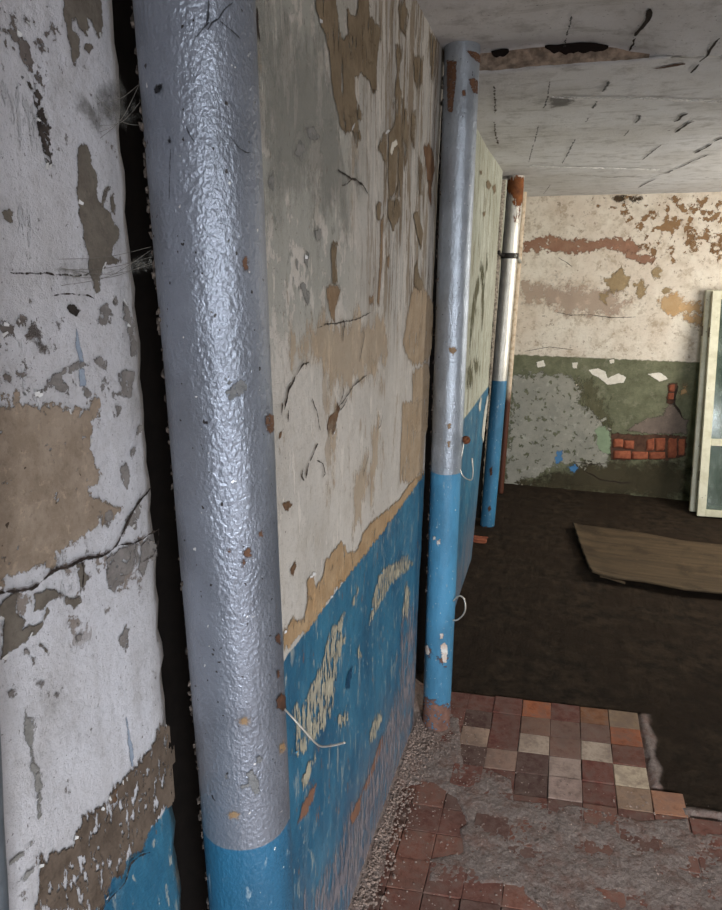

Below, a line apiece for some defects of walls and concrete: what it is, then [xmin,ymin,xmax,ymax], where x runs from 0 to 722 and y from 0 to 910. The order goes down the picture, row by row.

peeling [316,0,381,149]
corrosion [446,60,478,112]
hole [545,42,608,55]
peeling [76,143,119,294]
corrosion [507,175,524,224]
peeling [599,265,672,305]
crack [321,313,369,411]
peeling [283,260,433,650]
peeling [0,356,142,667]
crack [0,487,159,594]
corrosion [422,696,451,732]
peeling [34,723,175,910]